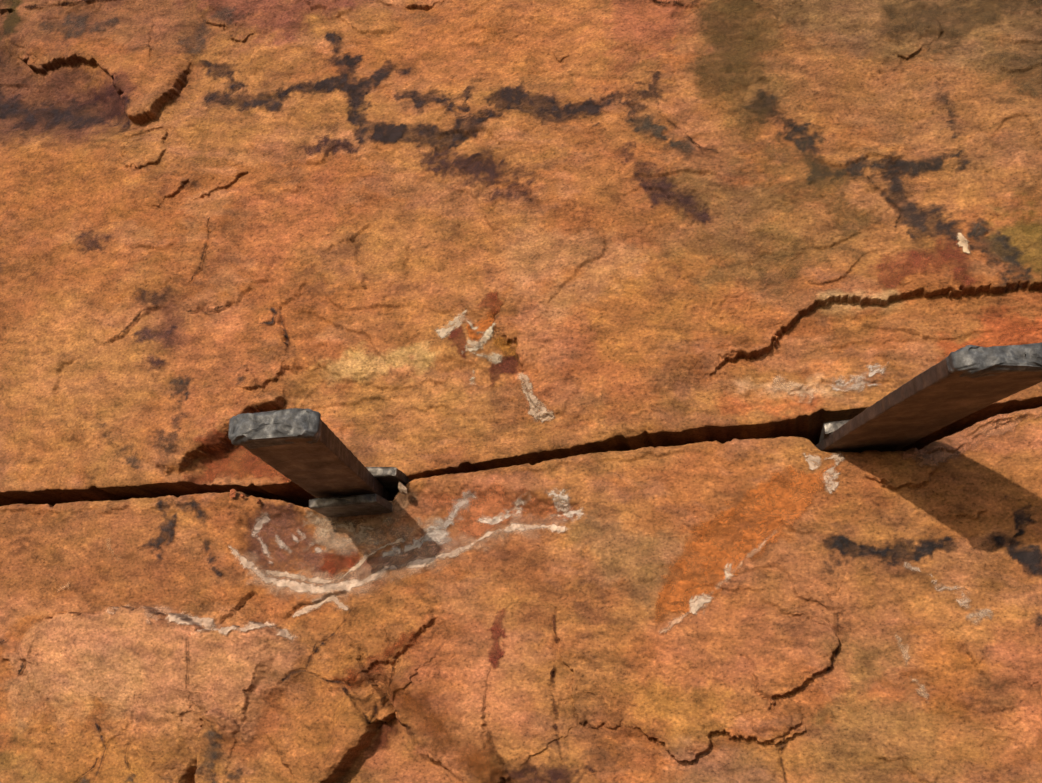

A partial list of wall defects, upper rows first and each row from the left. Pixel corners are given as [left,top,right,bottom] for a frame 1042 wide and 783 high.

water stain [0,82,129,134]
water stain [179,25,710,224]
water stain [696,0,1042,292]
water stain [825,535,952,568]
water stain [990,505,1042,575]